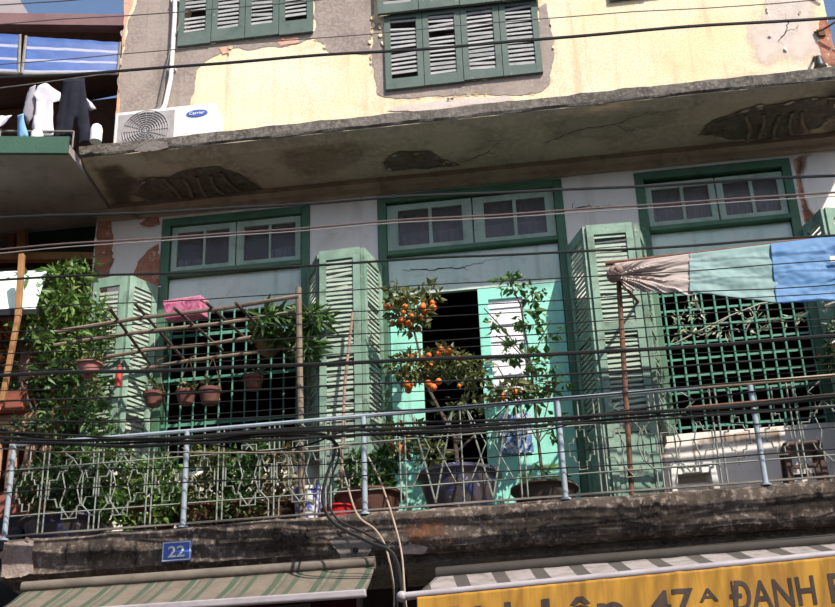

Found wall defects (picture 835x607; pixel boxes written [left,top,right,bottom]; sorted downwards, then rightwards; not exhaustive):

peeling [747,0,835,65]
peeling [115,0,555,116]
spalling [699,97,835,142]
spalling [383,151,461,172]
spalling [135,166,263,202]
flaking render [140,217,160,228]
flaking render [90,222,115,301]
flaking render [134,244,161,287]
crack [406,257,505,271]